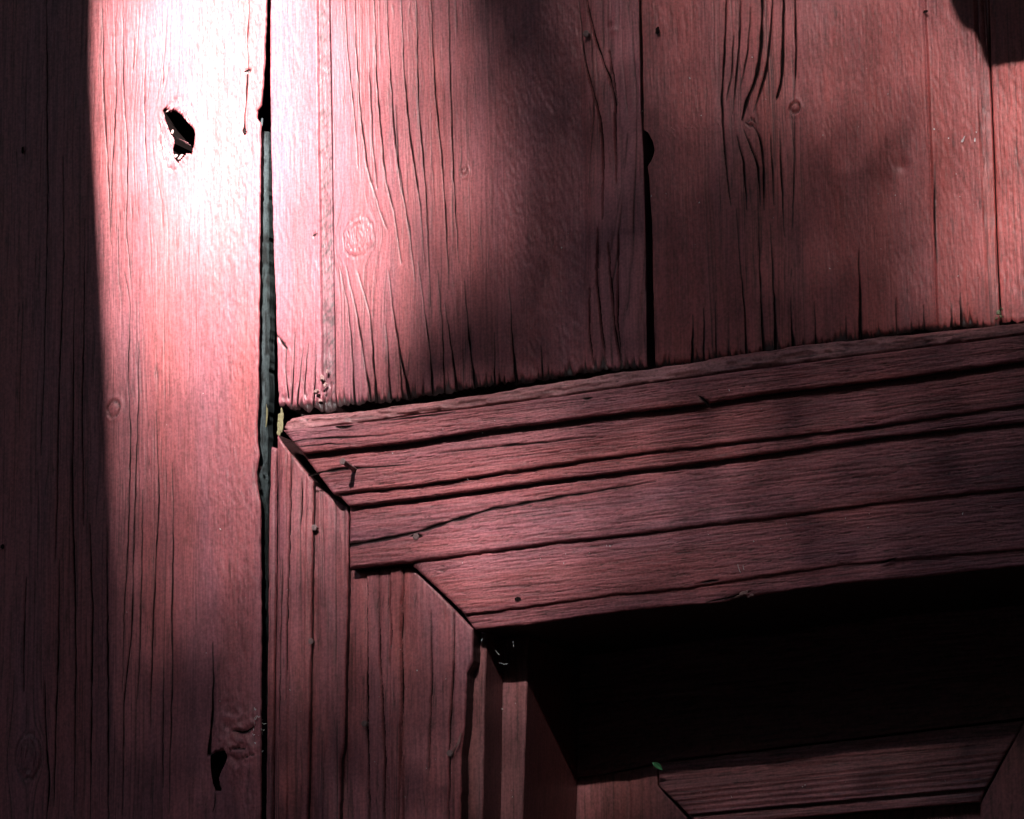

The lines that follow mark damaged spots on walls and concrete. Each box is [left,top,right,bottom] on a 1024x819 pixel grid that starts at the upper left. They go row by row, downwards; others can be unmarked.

crack [579,4,618,180]
crack [721,0,816,354]
crack [208,643,254,757]